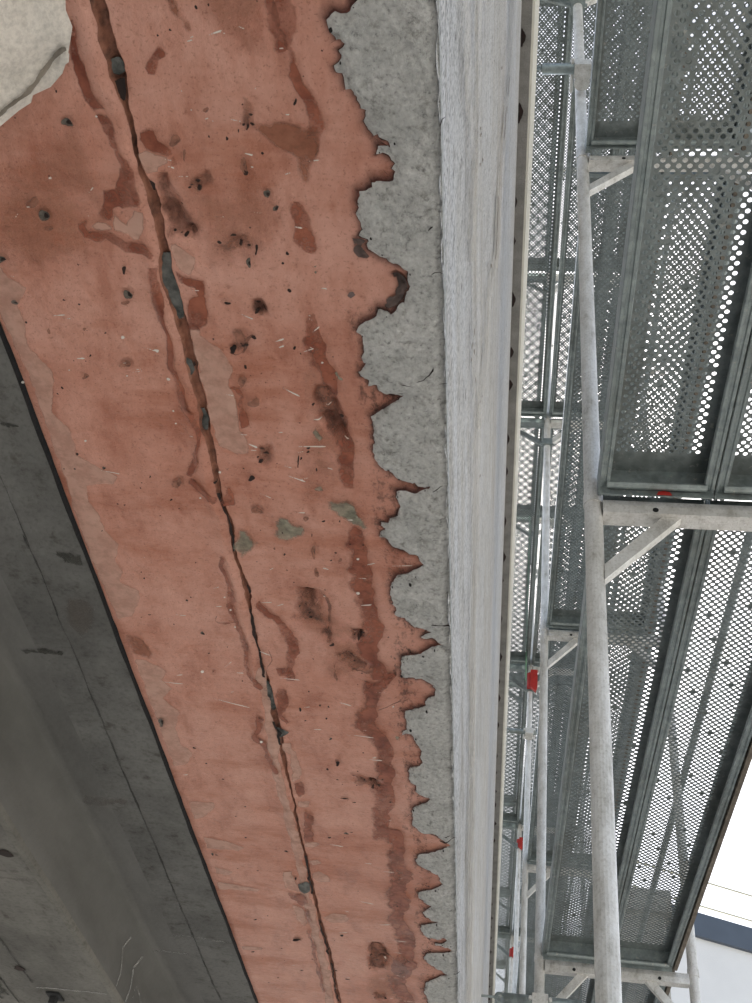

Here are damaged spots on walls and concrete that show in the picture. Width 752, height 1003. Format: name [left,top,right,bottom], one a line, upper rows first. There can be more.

corrosion [258,24,325,181]
peeling [0,268,140,618]
crack [90,0,341,1003]
peeling [190,329,270,463]
corrosion [303,321,354,488]
peeling [324,0,459,1003]
crack [360,369,476,439]
crack [379,625,450,726]
peeling [255,667,334,1003]
corrosion [345,527,417,1003]
crack [404,762,456,844]
corrosion [288,893,325,992]